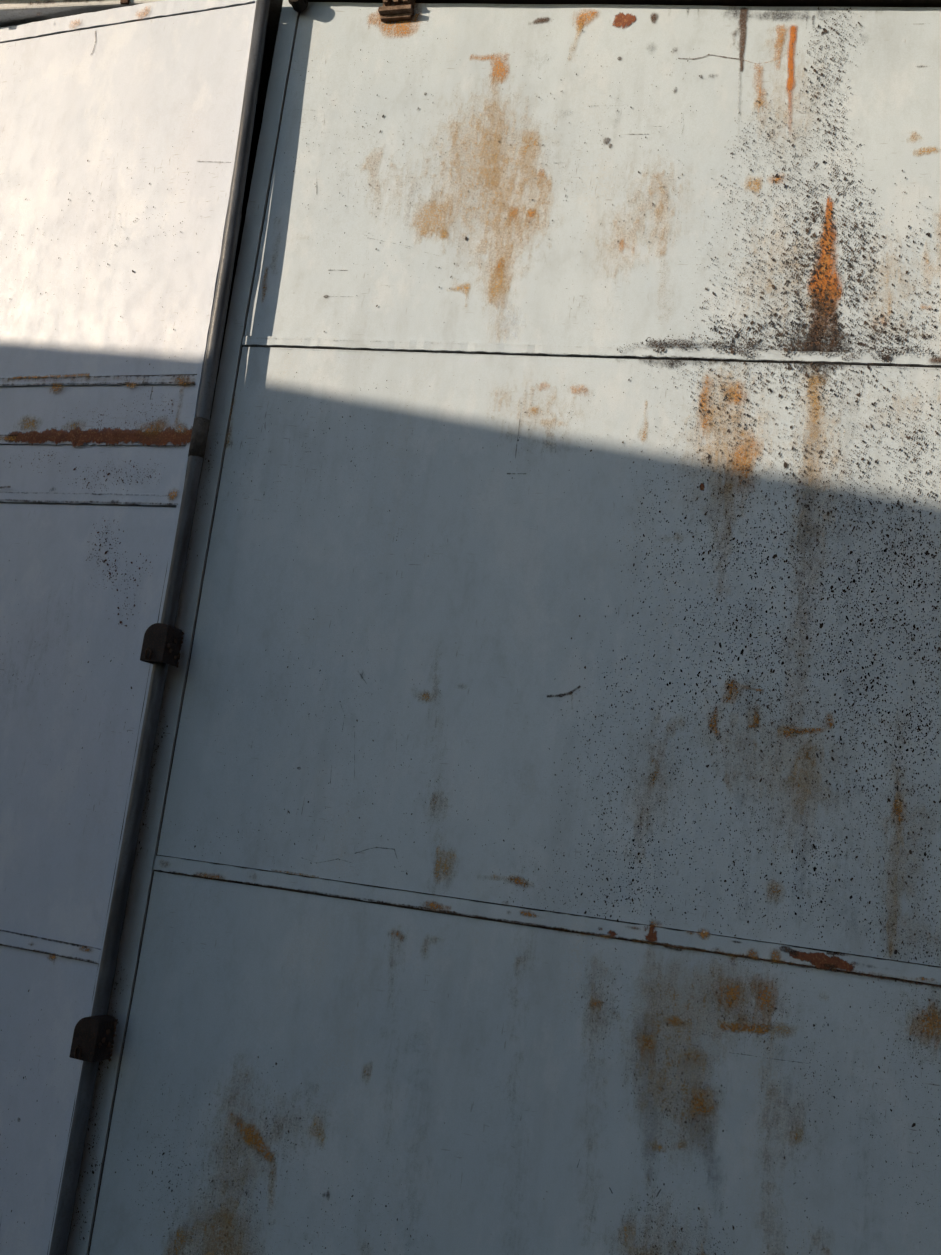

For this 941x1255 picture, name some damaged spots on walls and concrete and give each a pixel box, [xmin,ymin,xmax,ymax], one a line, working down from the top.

rust [471,55,508,80]
rust [776,26,797,103]
rust [415,116,550,243]
rust [796,198,843,436]
rust [0,418,193,447]
rust [700,376,742,428]
rust [159,870,941,1120]